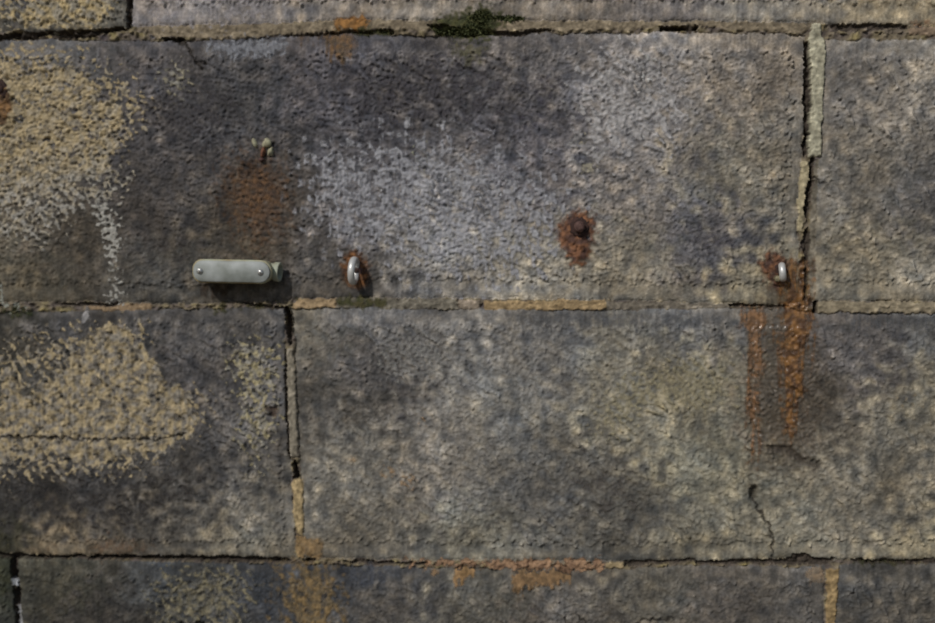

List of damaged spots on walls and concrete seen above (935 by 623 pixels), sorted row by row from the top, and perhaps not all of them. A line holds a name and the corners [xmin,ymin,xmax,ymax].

rust [0,88,11,125]
rust [557,211,595,266]
rust [340,250,368,287]
rust [757,251,816,437]
rust [740,306,766,454]
crack [1,434,183,442]